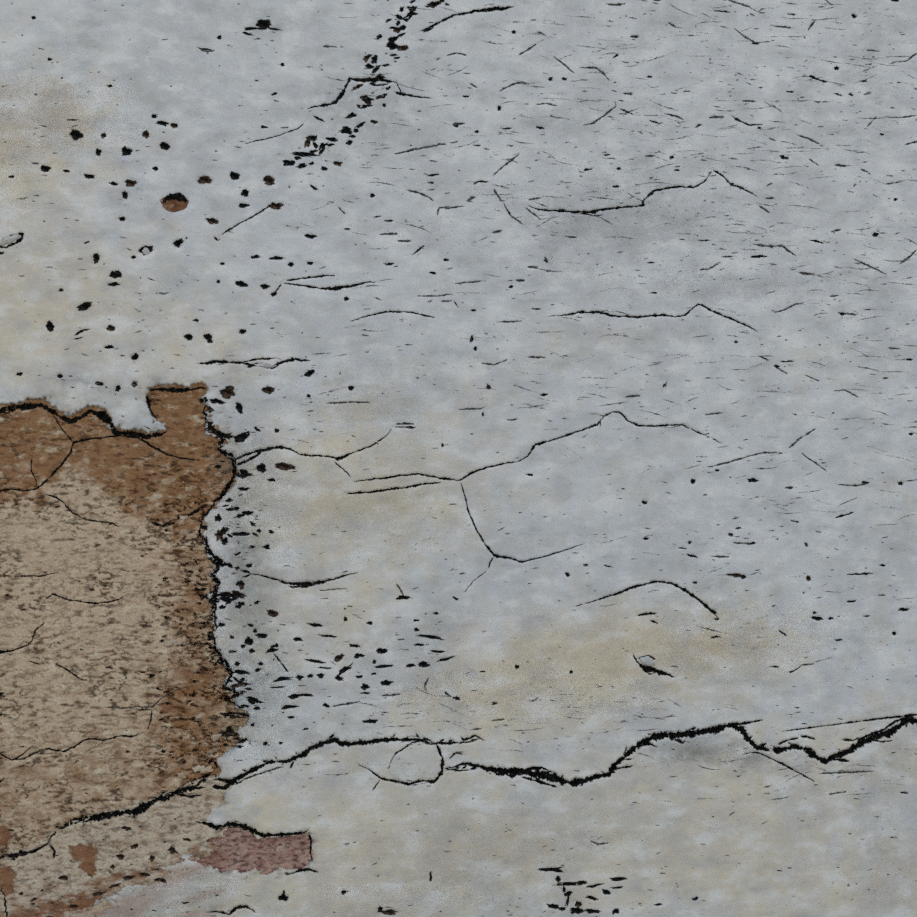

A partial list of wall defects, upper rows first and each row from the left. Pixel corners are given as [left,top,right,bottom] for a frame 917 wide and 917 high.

crack [423,0,514,31]
crack [246,77,429,144]
crack [408,154,774,233]
crack [274,274,375,294]
crack [352,281,480,321]
crack [548,304,756,331]
crack [198,357,310,369]
crack [0,387,866,708]
spalling [0,383,314,917]
crack [0,687,186,782]
crack [0,713,917,860]
crack [196,821,318,875]